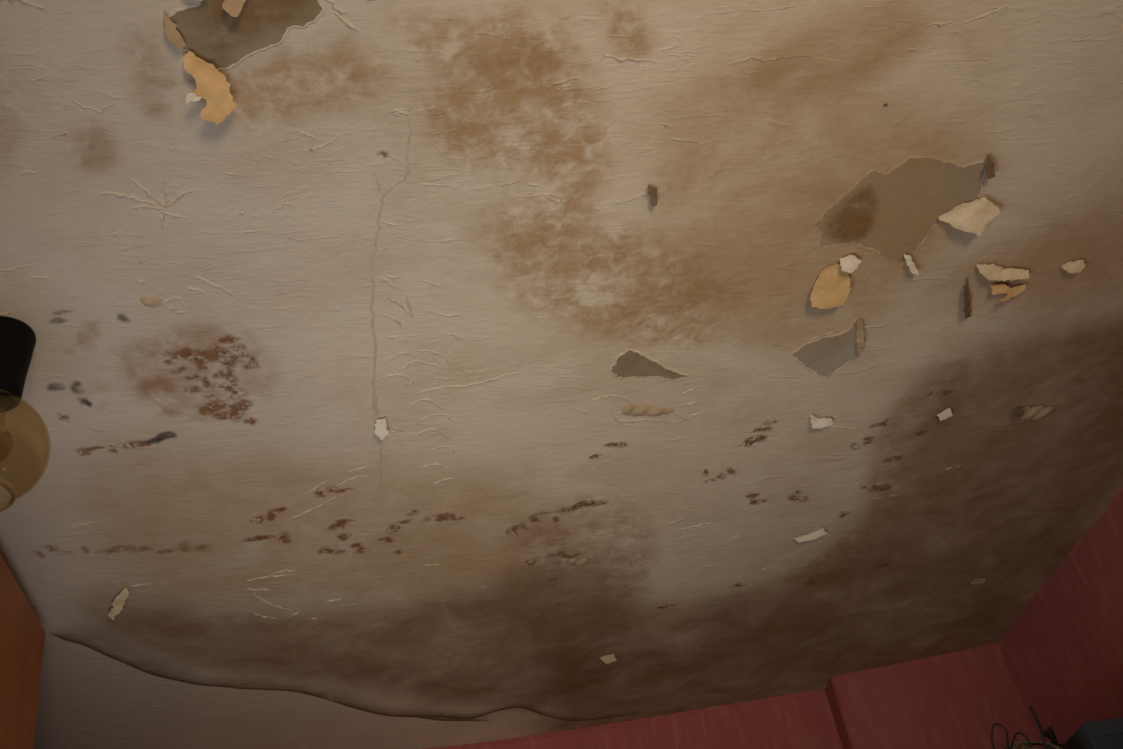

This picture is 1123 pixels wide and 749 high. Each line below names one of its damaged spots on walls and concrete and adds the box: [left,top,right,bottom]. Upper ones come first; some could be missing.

peeling [163,0,325,125]
peeling [810,154,1030,319]
peeling [1061,260,1086,274]
peeling [608,349,690,381]
peeling [790,316,865,379]
damp [57,325,1123,729]
peeling [793,528,827,543]
peeling [108,587,129,620]